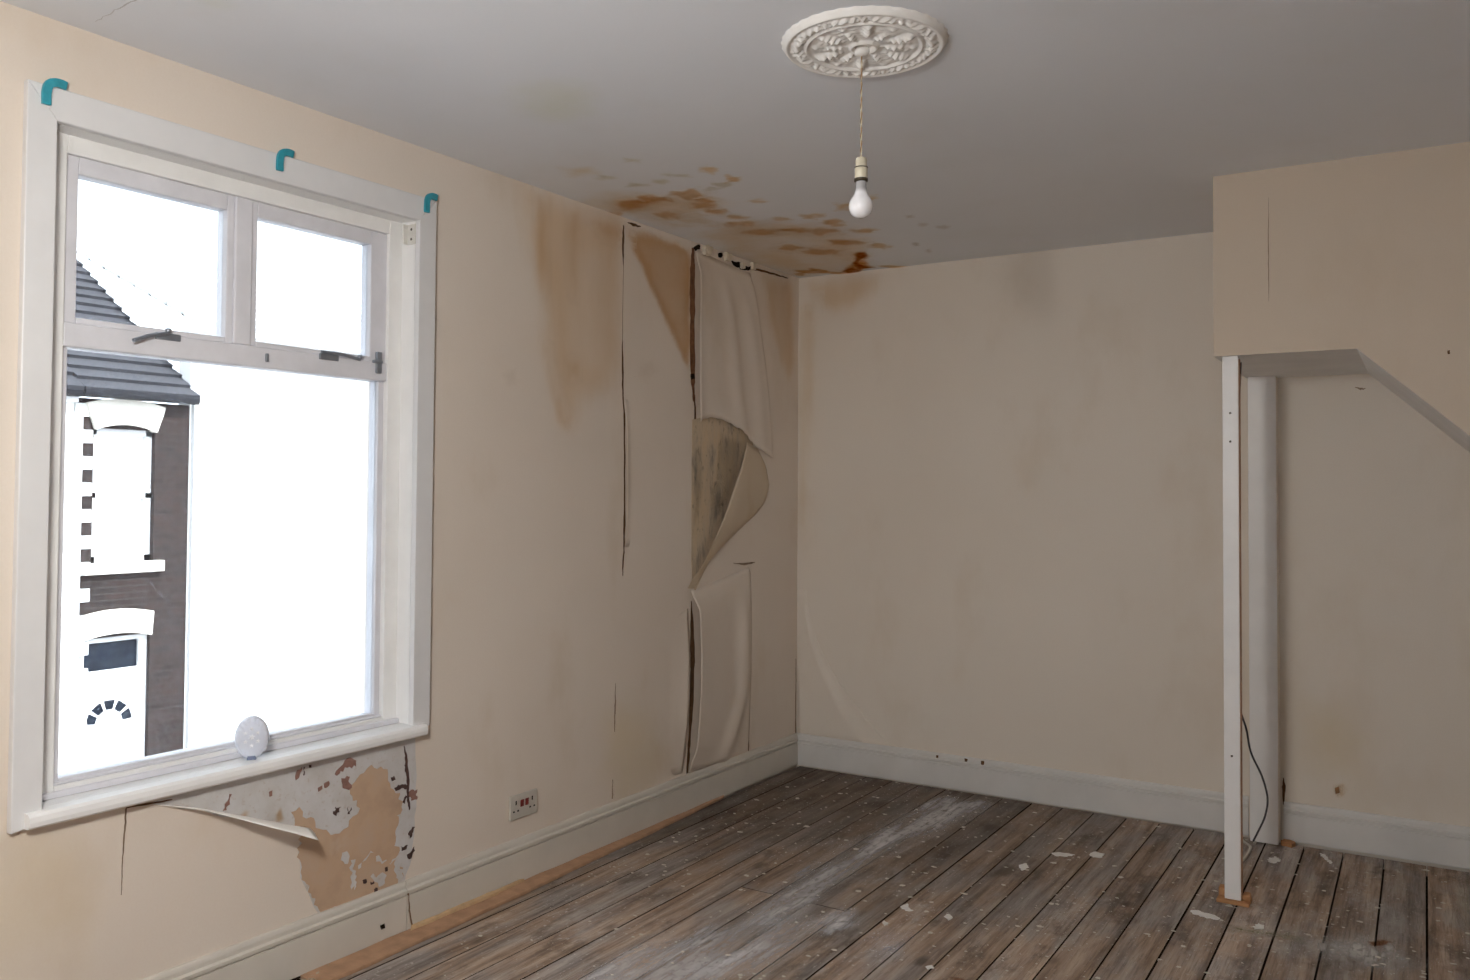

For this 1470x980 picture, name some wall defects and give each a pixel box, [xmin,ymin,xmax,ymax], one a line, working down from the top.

flaking render [693,244,788,279]
flaking render [688,417,769,590]
peeling [153,738,418,913]